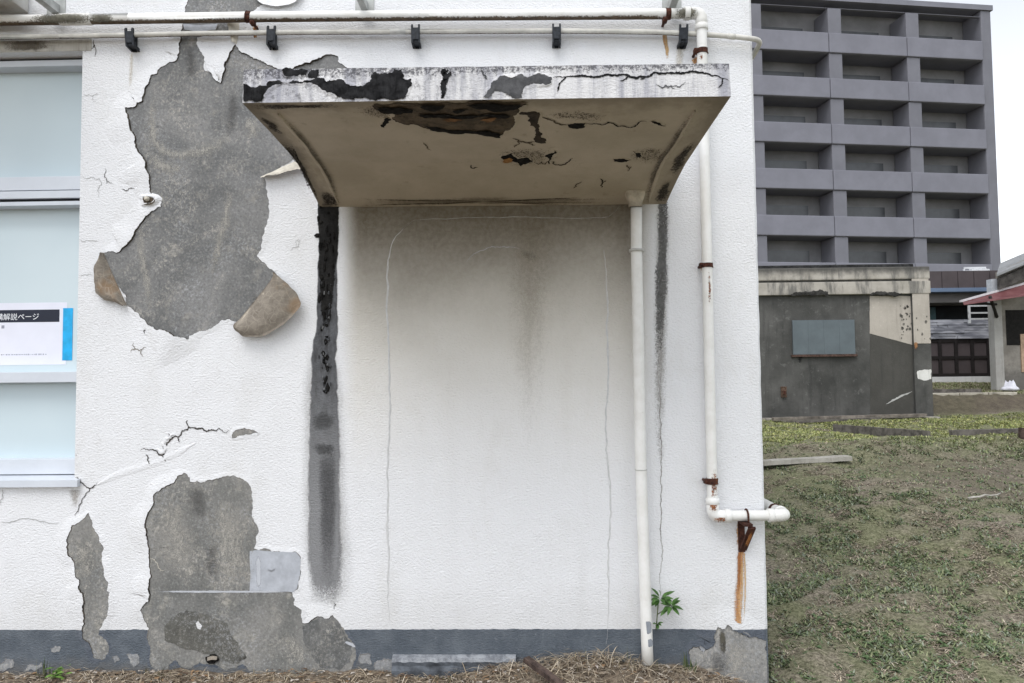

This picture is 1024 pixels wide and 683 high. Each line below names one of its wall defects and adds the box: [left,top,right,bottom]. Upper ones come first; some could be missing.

peeling [94,0,666,367]
crack [557,70,729,91]
crack [140,421,230,464]
water stain [259,104,341,595]
crack [385,204,622,634]
peeling [53,468,392,675]
peeling [684,604,767,683]
rust [734,524,752,624]